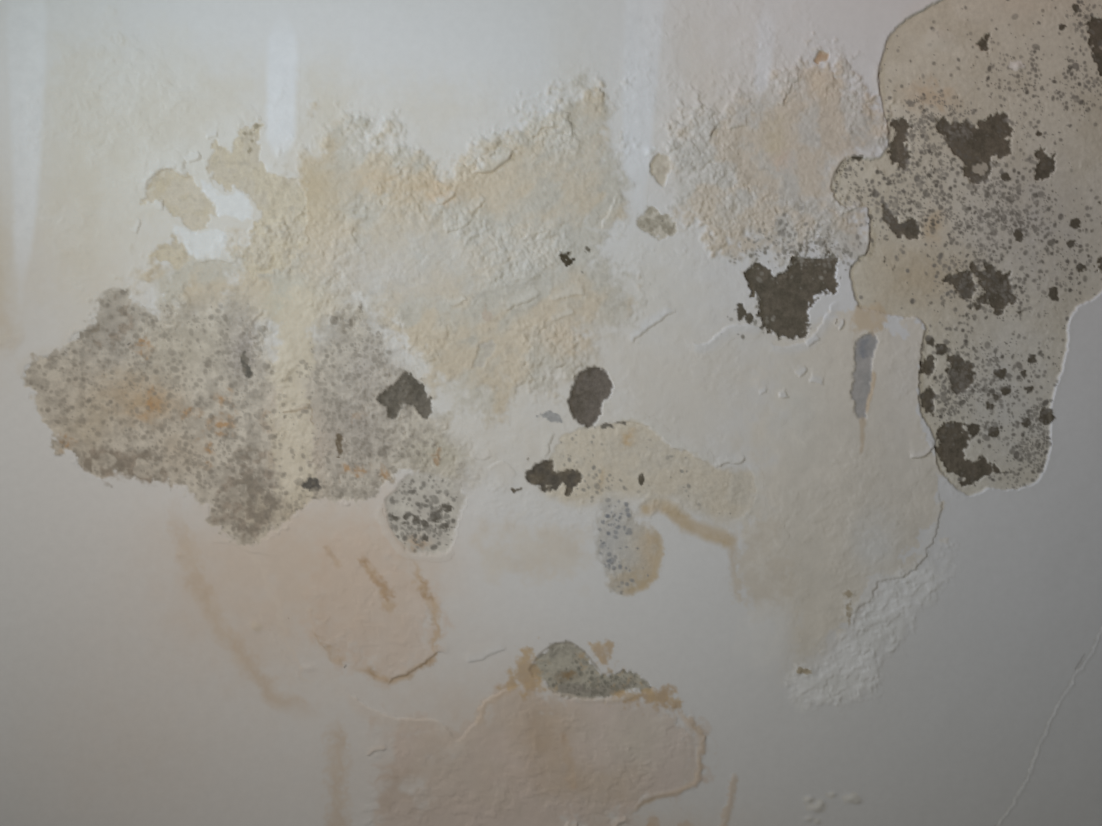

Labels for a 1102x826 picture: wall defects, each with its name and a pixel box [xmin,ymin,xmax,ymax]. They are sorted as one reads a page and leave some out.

spalling [12,116,768,599]
spalling [725,0,1102,498]
damp [287,500,741,826]
spalling [494,635,686,721]